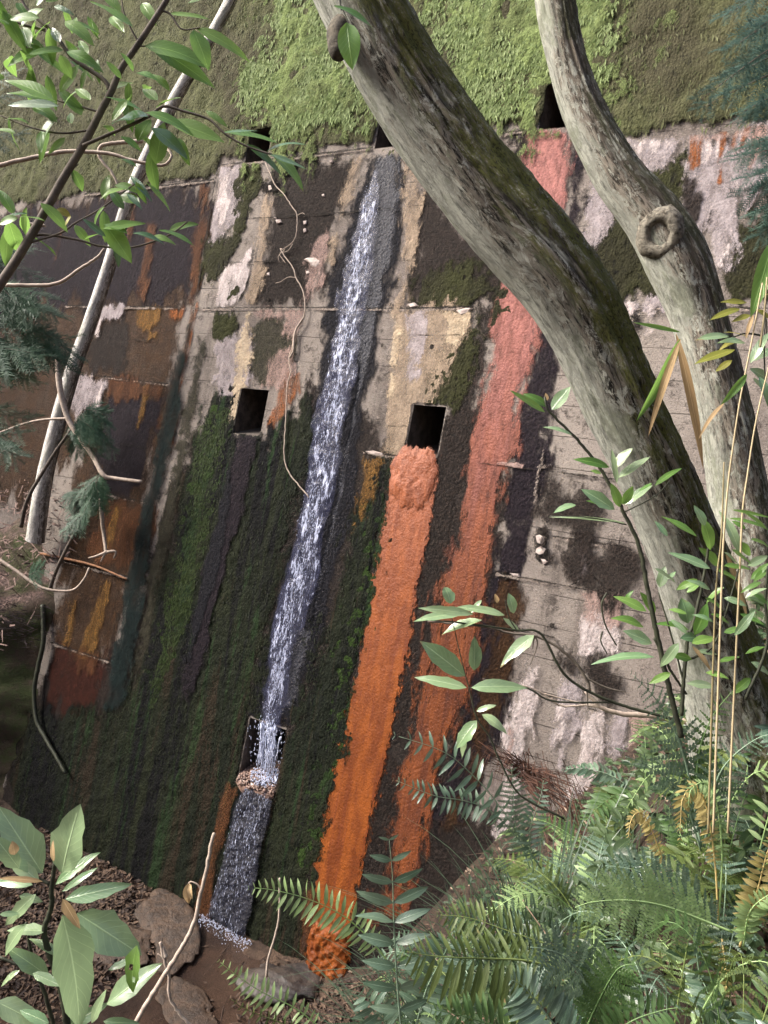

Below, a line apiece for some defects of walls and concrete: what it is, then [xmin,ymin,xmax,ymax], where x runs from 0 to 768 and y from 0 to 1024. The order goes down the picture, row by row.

damp [508,128,531,166]
corrosion [687,125,768,185]
corrosion [0,288,87,513]
corrosion [46,179,221,719]
damp [181,434,268,703]
corrosion [354,456,386,526]
damp [208,147,648,970]
damp [3,660,66,813]
corrosion [459,572,529,793]